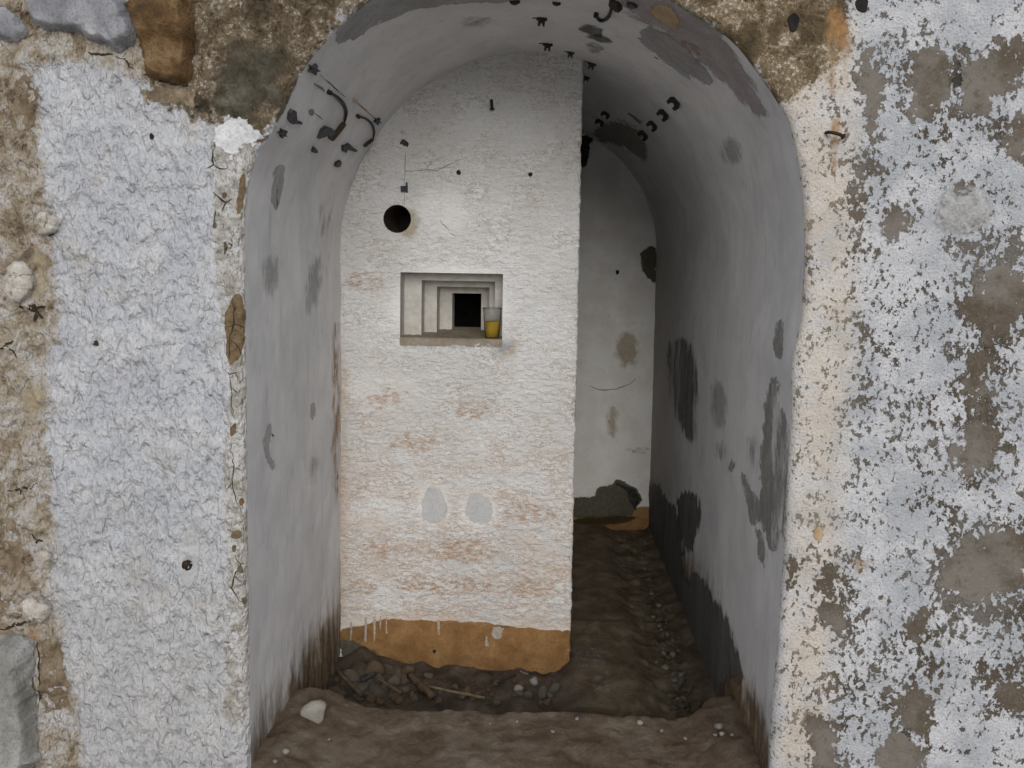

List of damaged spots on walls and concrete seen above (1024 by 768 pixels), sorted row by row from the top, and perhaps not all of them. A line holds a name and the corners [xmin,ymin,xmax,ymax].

flaking render [0,0,197,108]
corrosion [827,9,848,49]
peeling [850,42,887,141]
peeling [899,33,1024,165]
peeling [844,159,916,260]
flaking render [224,294,246,365]
leakage [668,338,697,441]
peeling [945,259,1024,482]
peeling [812,553,851,639]
peeling [932,522,1024,613]
leakage [289,628,379,698]
peeling [867,681,939,768]